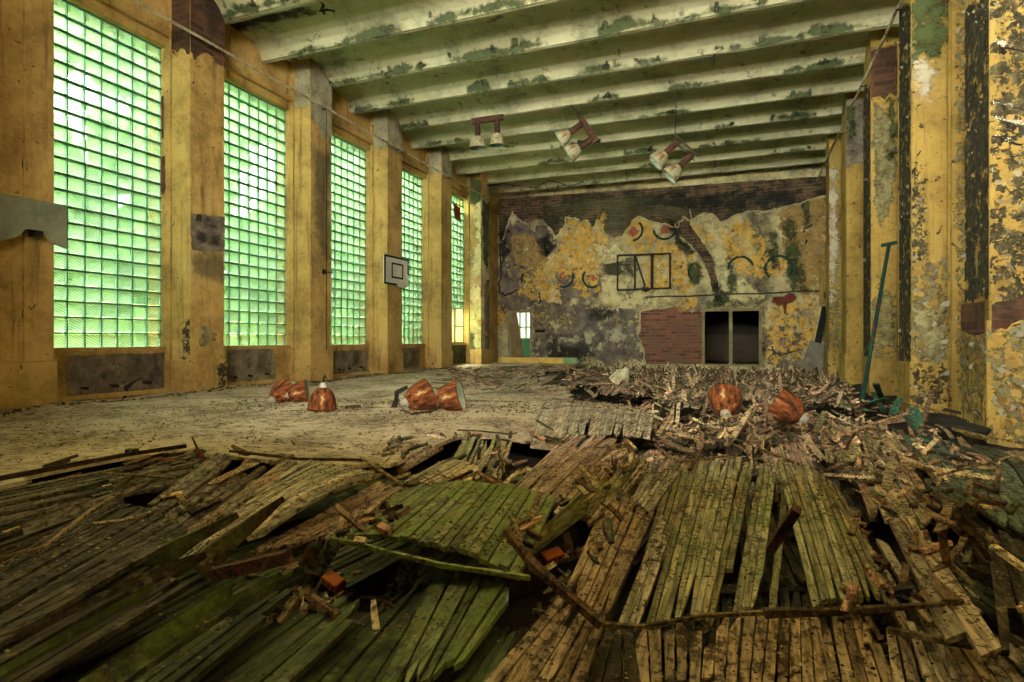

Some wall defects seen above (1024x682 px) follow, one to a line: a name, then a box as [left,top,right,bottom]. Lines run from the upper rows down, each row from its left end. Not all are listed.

flaking render [171,0,225,68]
flaking render [294,60,333,144]
flaking render [374,109,402,153]
flaking render [429,146,451,177]
flaking render [452,0,1024,448]
water stain [498,220,645,367]